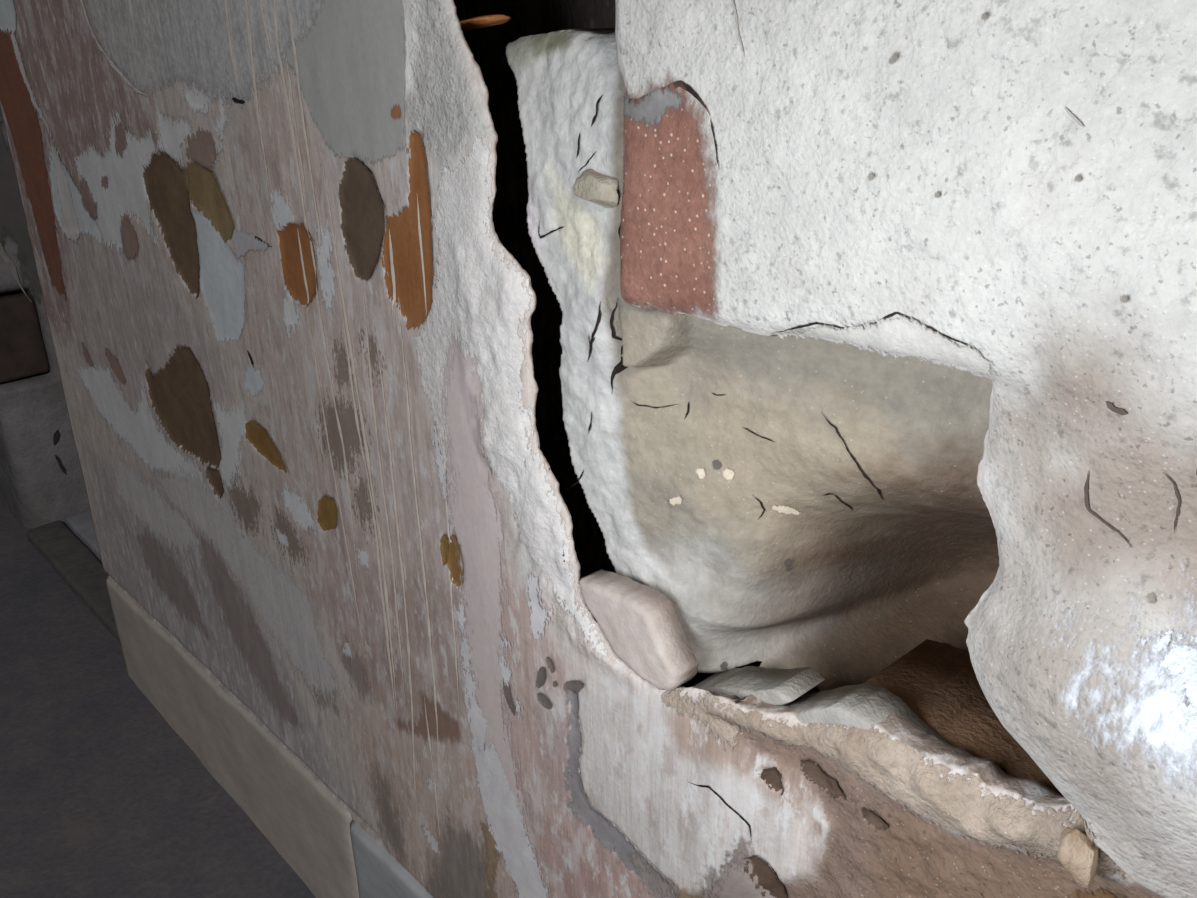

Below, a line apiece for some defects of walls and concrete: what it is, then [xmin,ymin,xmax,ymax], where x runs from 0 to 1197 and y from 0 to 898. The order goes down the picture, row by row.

peeling [0,0,16,34]
spalling [460,15,511,31]
crack [1064,107,1084,128]
flaking render [86,0,323,298]
flaking render [268,130,433,330]
crack [776,312,978,351]
peeling [81,341,126,384]
flaking render [145,327,387,566]
spalling [505,28,1125,882]
flaking render [440,534,464,587]
leakage [1062,601,1197,788]
spalling [744,855,787,898]